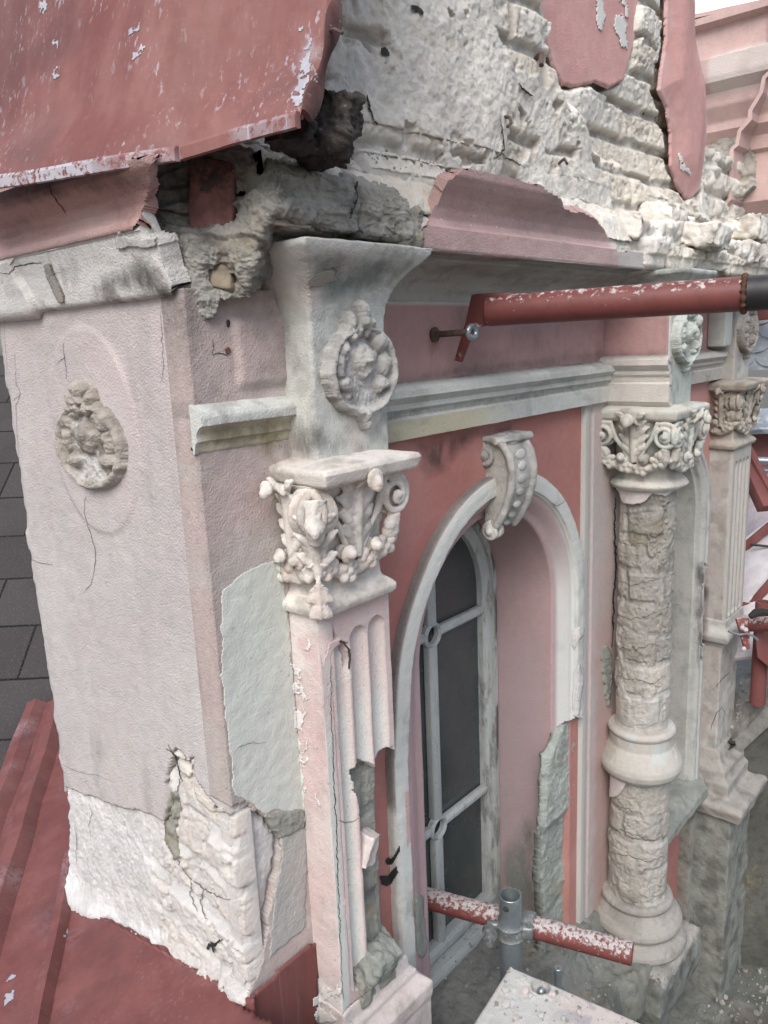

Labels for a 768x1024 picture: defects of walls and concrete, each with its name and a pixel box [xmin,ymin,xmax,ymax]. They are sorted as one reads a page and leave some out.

peeling [291,26,312,106]
peeling [596,0,629,49]
peeling [678,153,691,176]
crack [612,497,669,651]
flaking render [65,749,306,1006]
crack [164,745,230,919]
flaking render [349,759,428,1010]
flaking render [532,665,584,922]